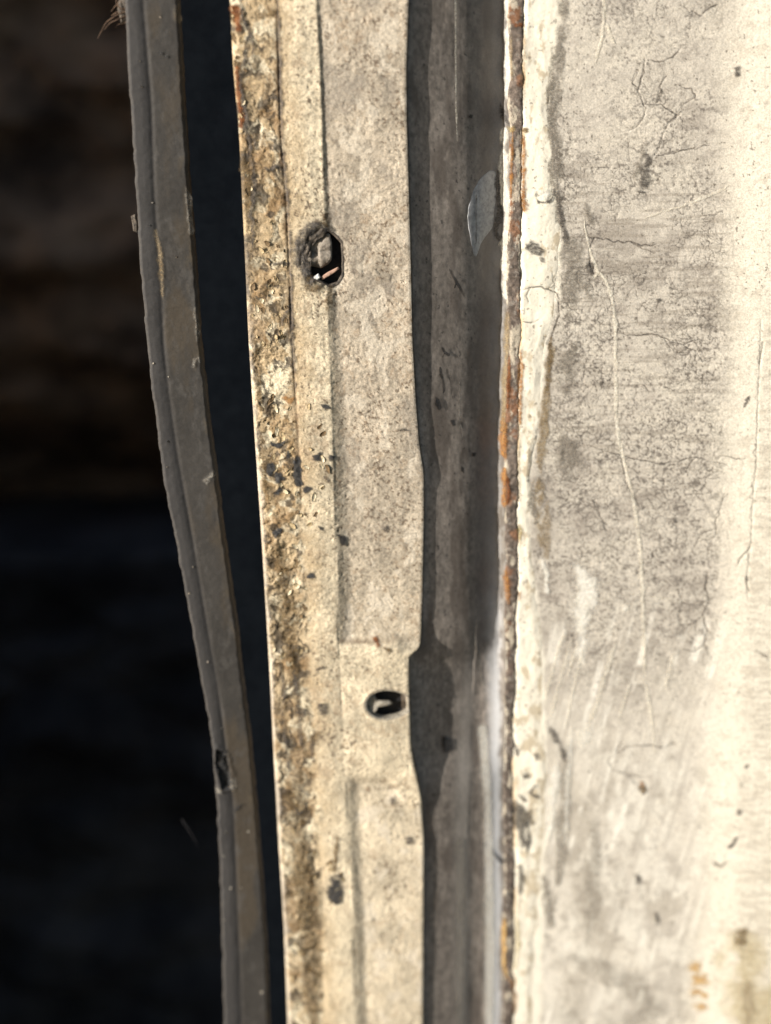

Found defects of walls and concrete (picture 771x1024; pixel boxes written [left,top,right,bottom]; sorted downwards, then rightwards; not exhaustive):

crack [634,51,695,127]
rust [509,127,528,211]
rust [499,313,524,506]
rust [501,920,520,1012]